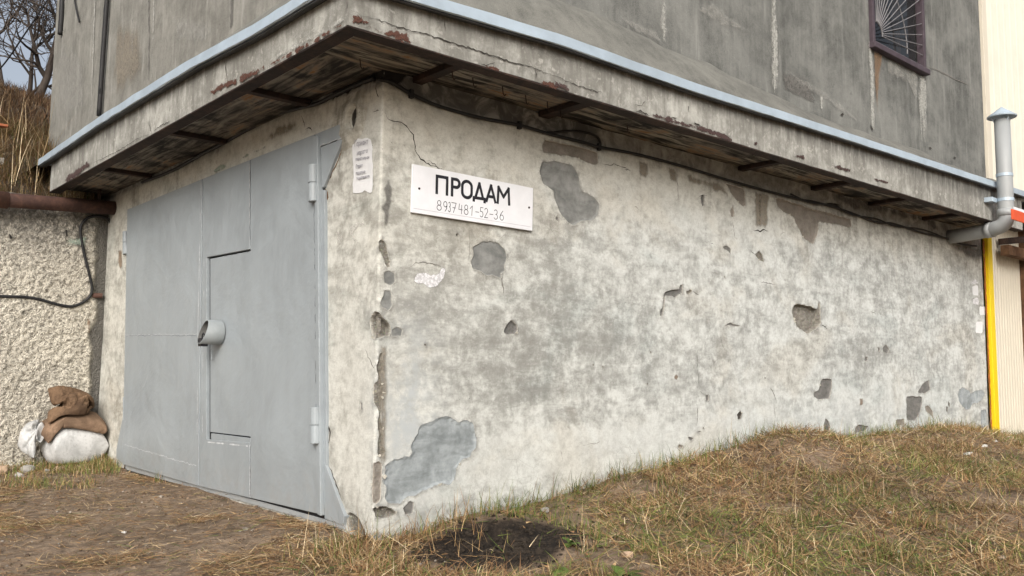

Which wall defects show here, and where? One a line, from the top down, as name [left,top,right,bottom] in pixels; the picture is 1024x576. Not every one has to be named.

corrosion [211,15,410,94]
damp [772,0,823,108]
crack [374,88,442,169]
corrosion [653,114,732,141]
spalling [379,239,391,268]
spalling [370,311,391,339]
spalling [792,302,827,334]
spalling [814,378,832,400]
spalling [896,380,933,426]
spalling [360,352,414,519]